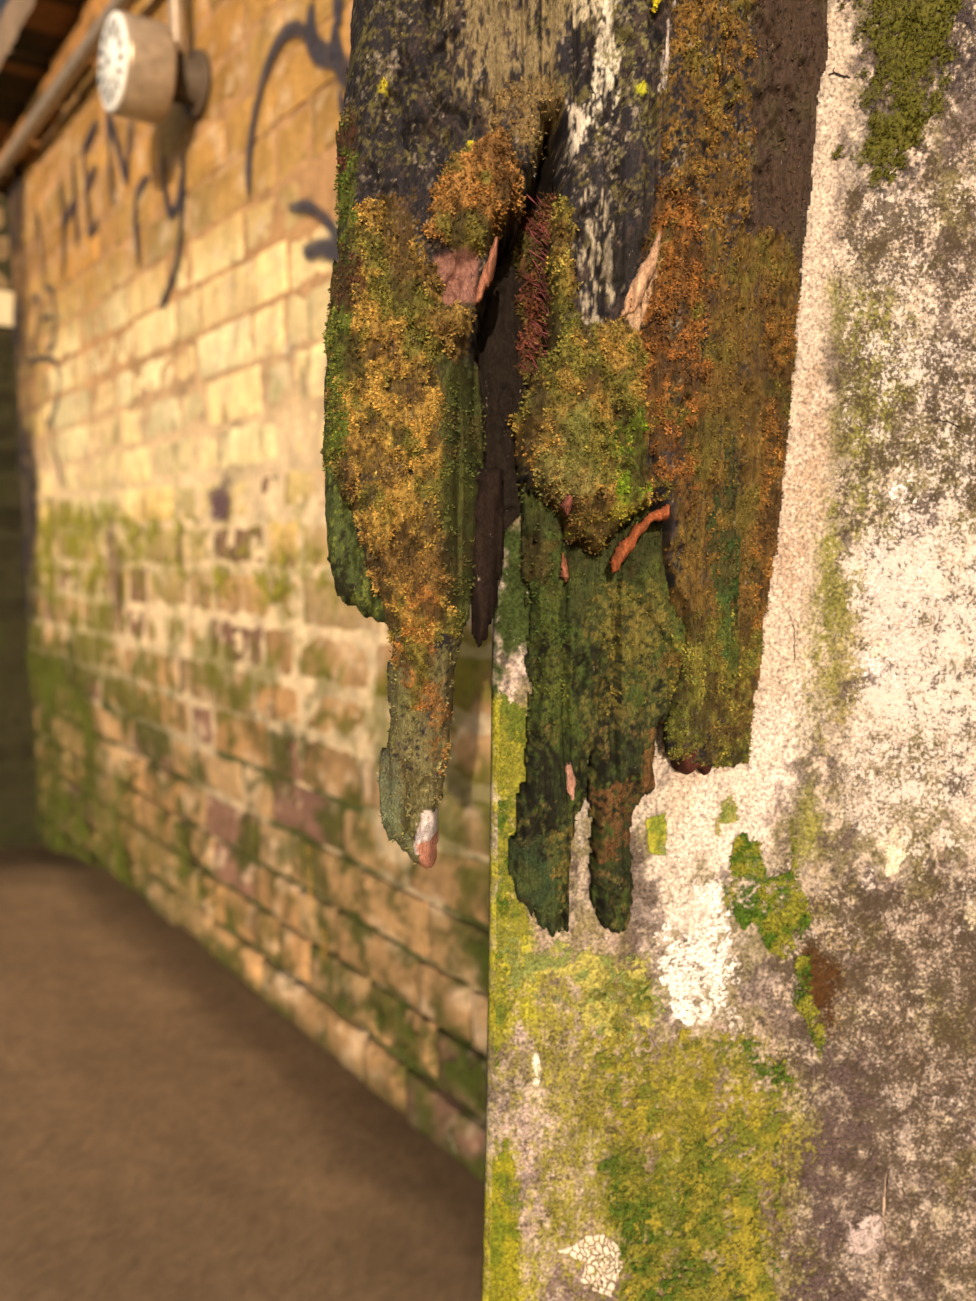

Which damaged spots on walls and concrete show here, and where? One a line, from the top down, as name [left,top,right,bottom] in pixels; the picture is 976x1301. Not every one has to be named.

water stain [8,166,337,961]
water stain [302,691,899,1301]